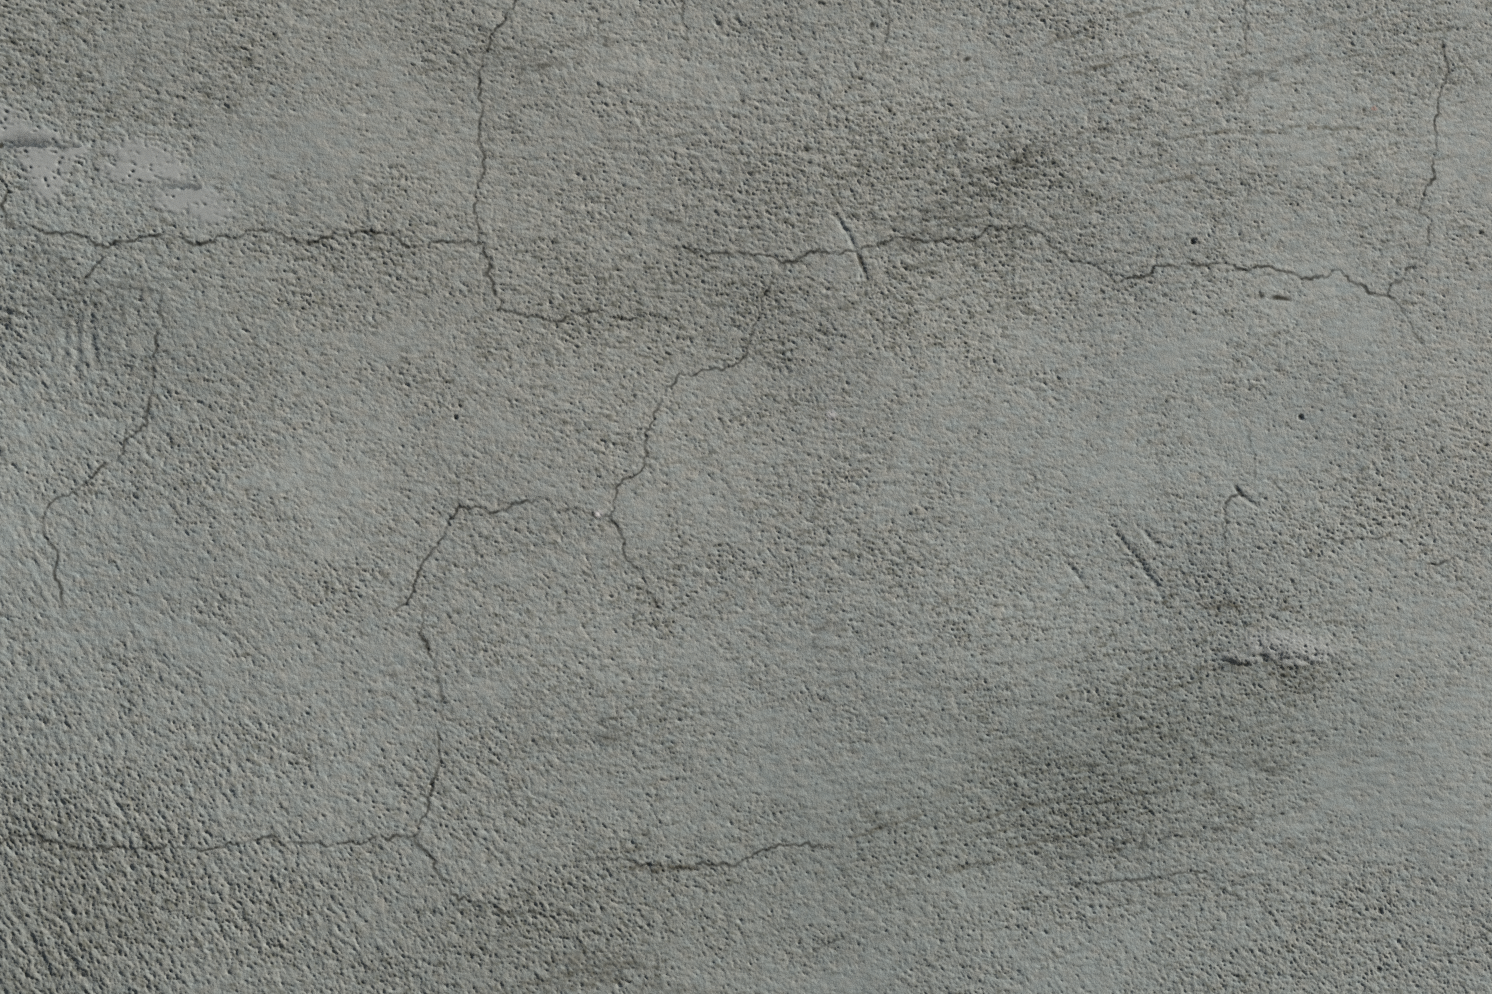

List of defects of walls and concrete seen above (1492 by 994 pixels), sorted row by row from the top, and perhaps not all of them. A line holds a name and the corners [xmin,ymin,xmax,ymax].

crack [38,0,634,322]
crack [1424,97,1439,192]
crack [685,226,1057,292]
crack [1126,263,1406,300]
crack [44,336,158,597]
crack [590,357,744,608]
crack [401,500,529,655]
crack [5,836,267,852]
crack [318,777,507,914]
crack [618,842,816,869]